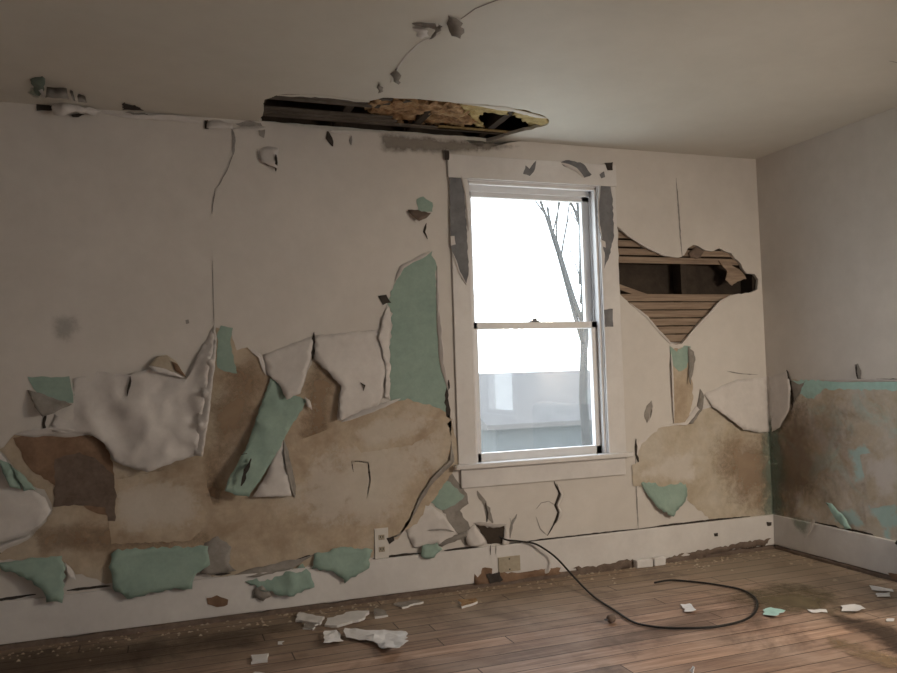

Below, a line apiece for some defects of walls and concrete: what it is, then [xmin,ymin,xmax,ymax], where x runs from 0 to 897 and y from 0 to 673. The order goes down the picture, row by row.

crack [377,0,498,93]
peeling [29,76,279,171]
spalling [462,103,548,119]
peeling [561,160,897,545]
peeling [0,251,510,603]
leakage [768,424,781,514]
crack [477,481,750,544]
crack [373,552,421,560]
crack [444,544,477,552]
crack [0,593,36,601]
crack [67,584,110,592]
peeling [207,595,228,607]